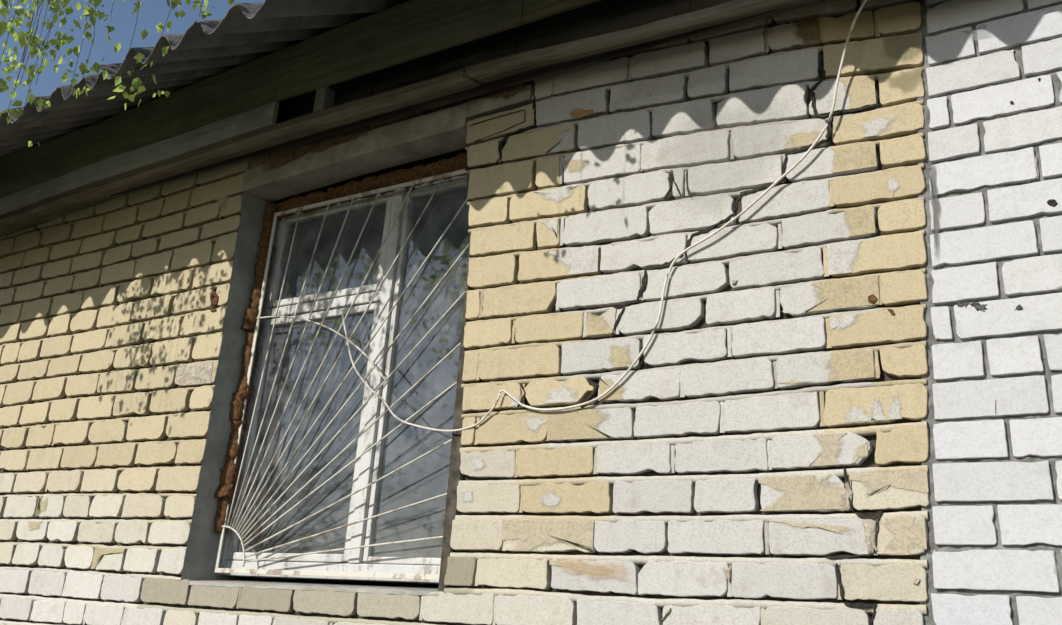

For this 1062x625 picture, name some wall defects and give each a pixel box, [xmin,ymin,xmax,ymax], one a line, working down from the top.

peeling [839,75,876,109]
crack [464,81,537,170]
peeling [783,116,896,173]
crack [611,52,880,337]
peeling [540,218,598,275]
peeling [804,205,880,329]
peeling [526,378,624,440]
crack [580,381,599,407]
peeling [828,349,874,381]
peeling [758,396,928,534]
crack [825,465,882,625]
peeling [862,517,927,555]